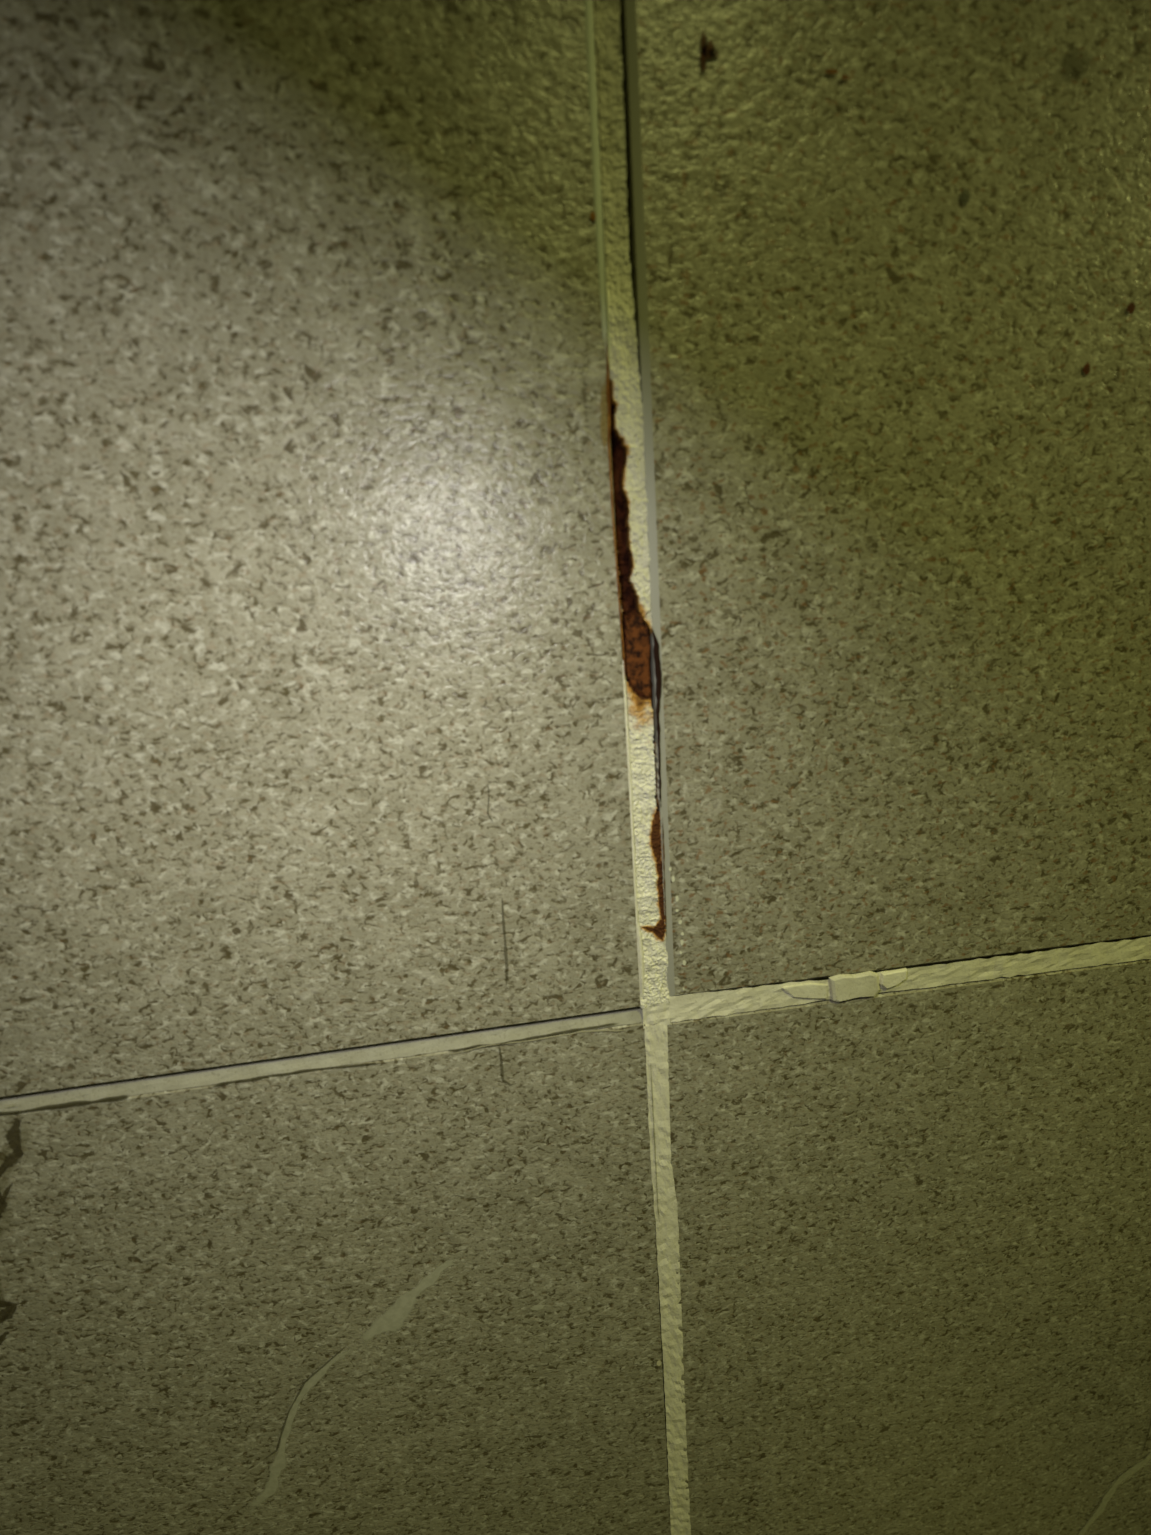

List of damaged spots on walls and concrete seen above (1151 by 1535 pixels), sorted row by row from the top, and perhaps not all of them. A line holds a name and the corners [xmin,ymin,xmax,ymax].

peeling [592,0,670,1008]
corrosion [625,612,662,806]
crack [214,1063,377,1086]
crack [449,1023,630,1054]
crack [0,1095,128,1218]
crack [0,1300,17,1344]